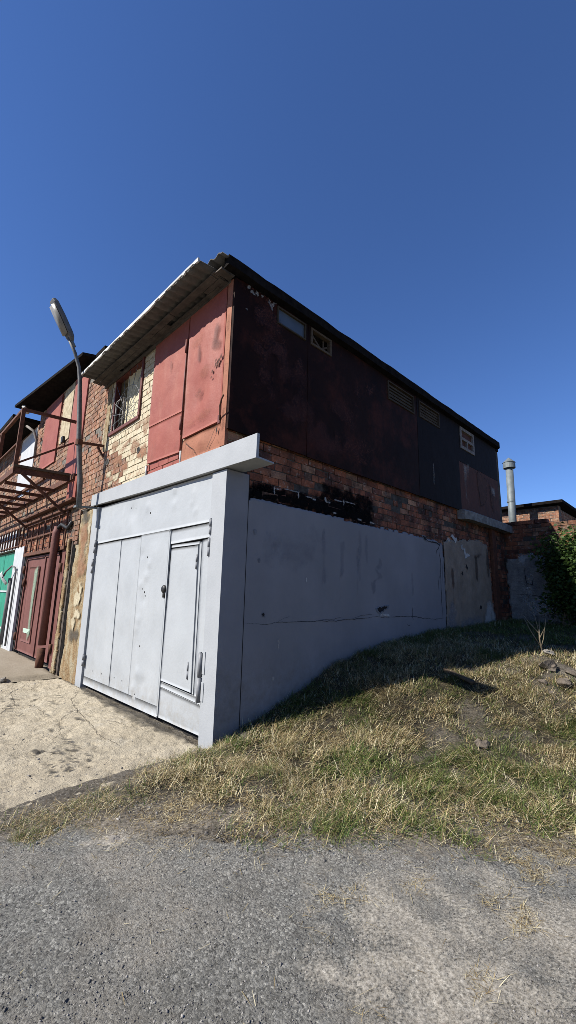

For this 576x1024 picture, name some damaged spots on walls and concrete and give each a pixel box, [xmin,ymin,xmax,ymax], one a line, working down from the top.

peeling [102,426,146,487]
flaking render [69,510,91,642]
crack [247,540,443,626]